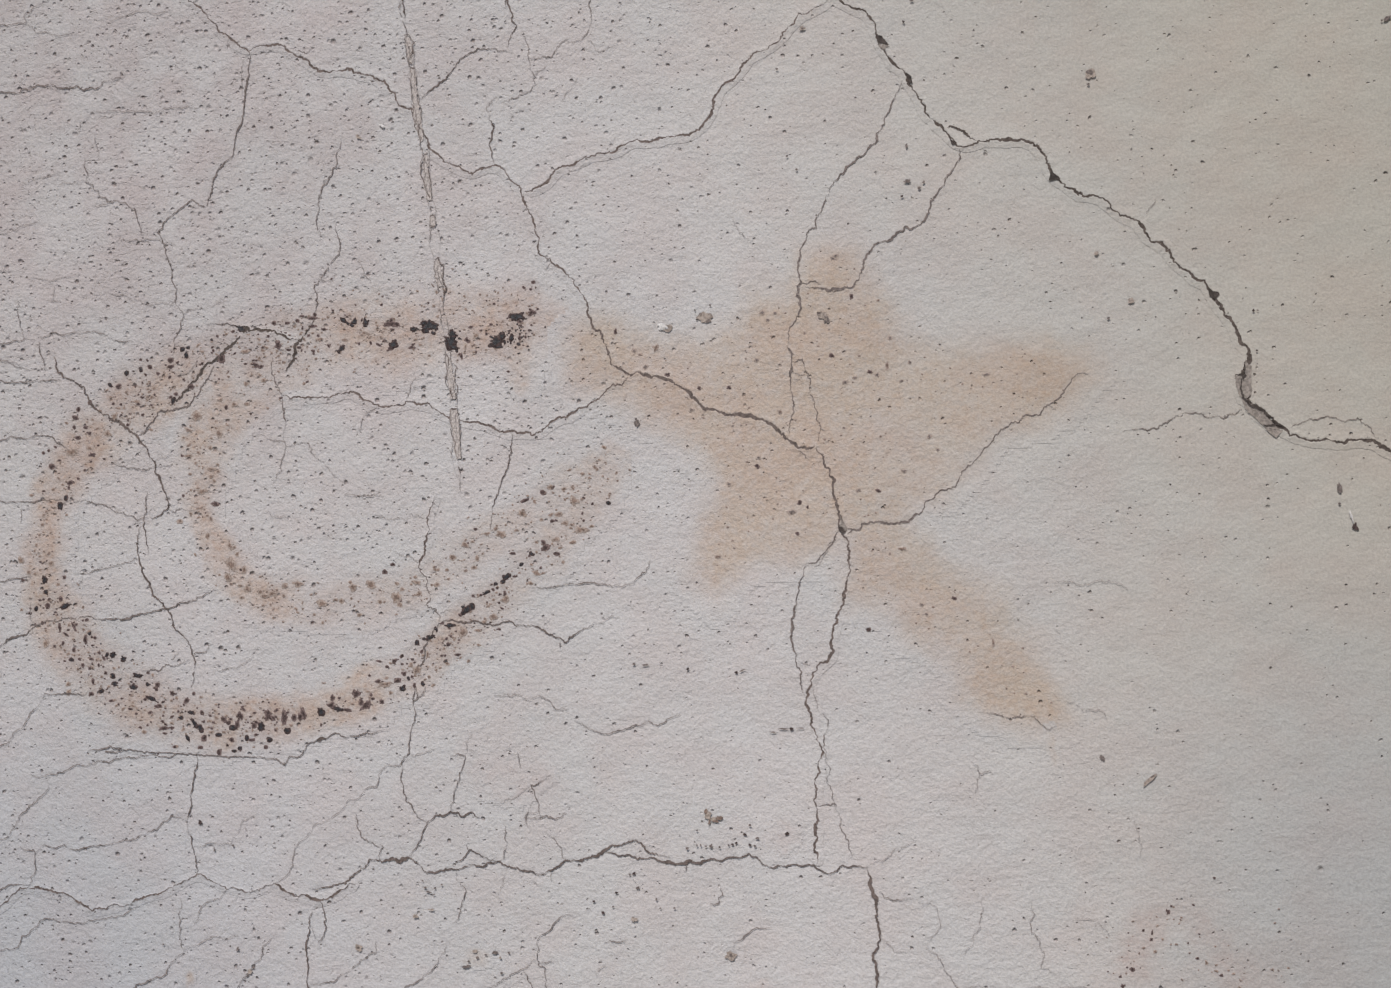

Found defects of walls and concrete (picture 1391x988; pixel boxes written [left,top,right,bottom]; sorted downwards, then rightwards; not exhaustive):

crack [808,0,1391,460]
rust [12,265,632,765]
crack [0,0,1077,941]
water stain [544,229,1119,775]
crack [987,700,1106,730]
crack [0,918,60,951]
crack [305,913,360,988]
crack [493,914,569,988]
crack [867,870,890,988]
crack [922,902,958,988]
crack [1030,905,1082,988]